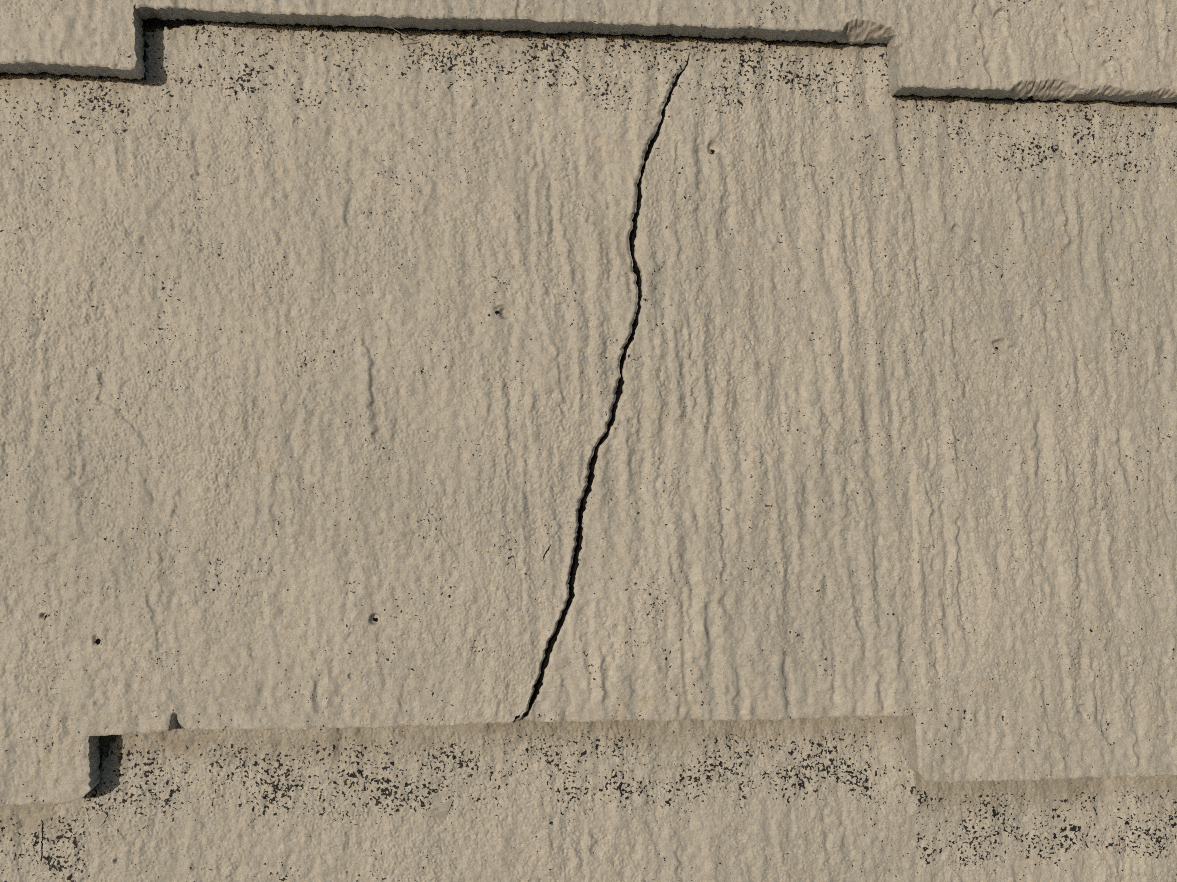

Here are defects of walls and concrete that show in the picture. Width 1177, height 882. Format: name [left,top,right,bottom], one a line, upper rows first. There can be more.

crack [513,54,690,722]